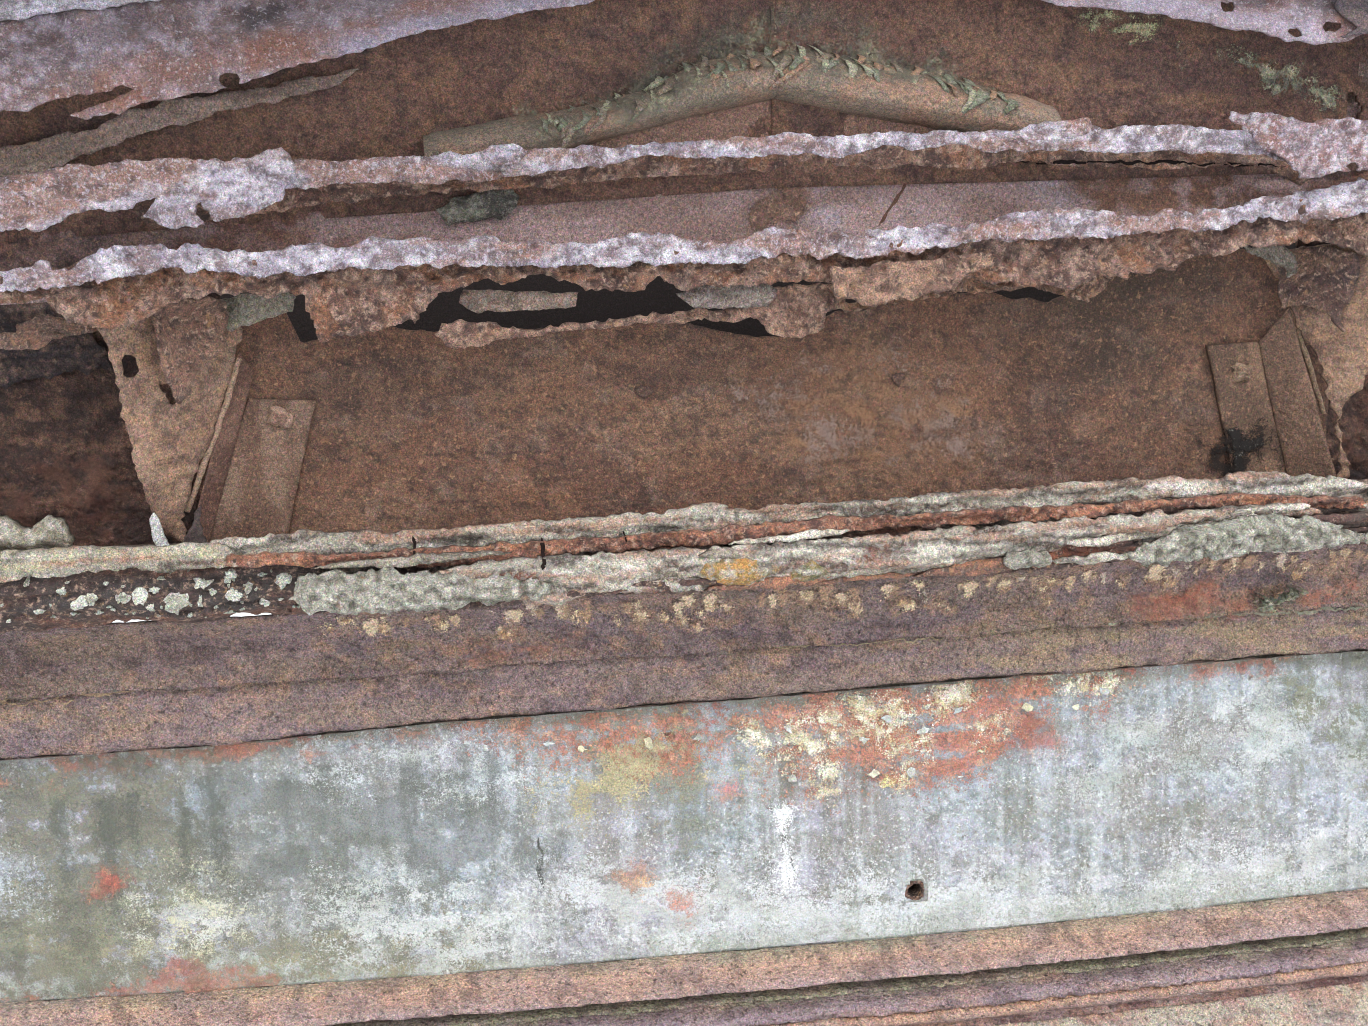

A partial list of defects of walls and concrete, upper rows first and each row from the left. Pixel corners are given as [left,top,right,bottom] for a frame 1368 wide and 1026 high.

rust [747,186,811,235]
peeling [0,314,98,350]
peeling [151,292,296,404]
peeling [1276,246,1360,332]
rust [720,320,1003,492]
rust [0,416,1368,633]
water stain [1263,652,1368,793]
water stain [0,707,777,1004]
water stain [767,799,805,900]